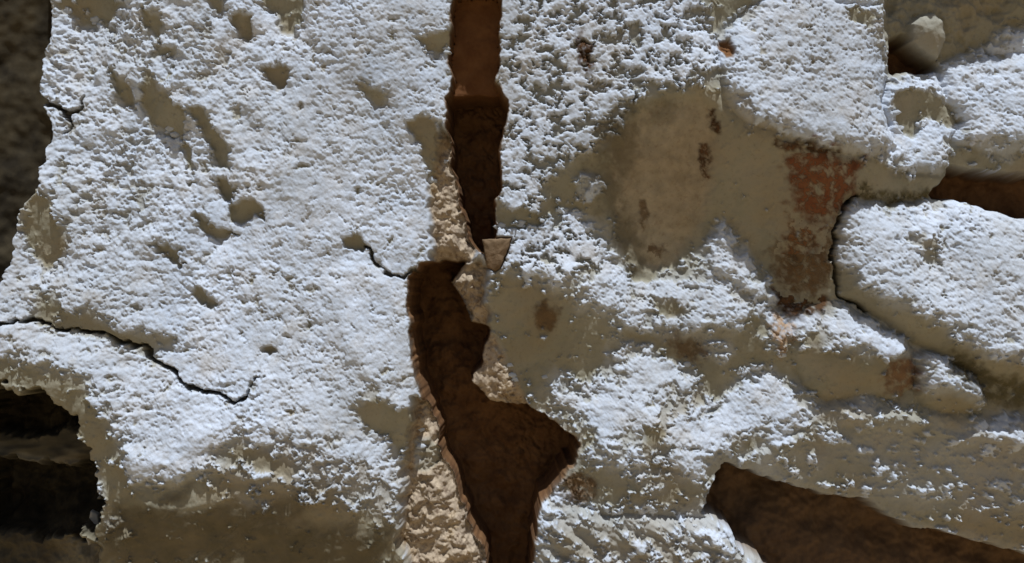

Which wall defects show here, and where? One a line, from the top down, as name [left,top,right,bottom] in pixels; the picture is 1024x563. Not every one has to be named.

peeling [418,29,456,58]
damp [710,109,720,134]
peeling [413,127,449,187]
damp [698,143,711,179]
peeling [493,200,561,231]
corrosion [770,135,866,353]
crack [365,0,578,563]
crack [0,317,261,407]